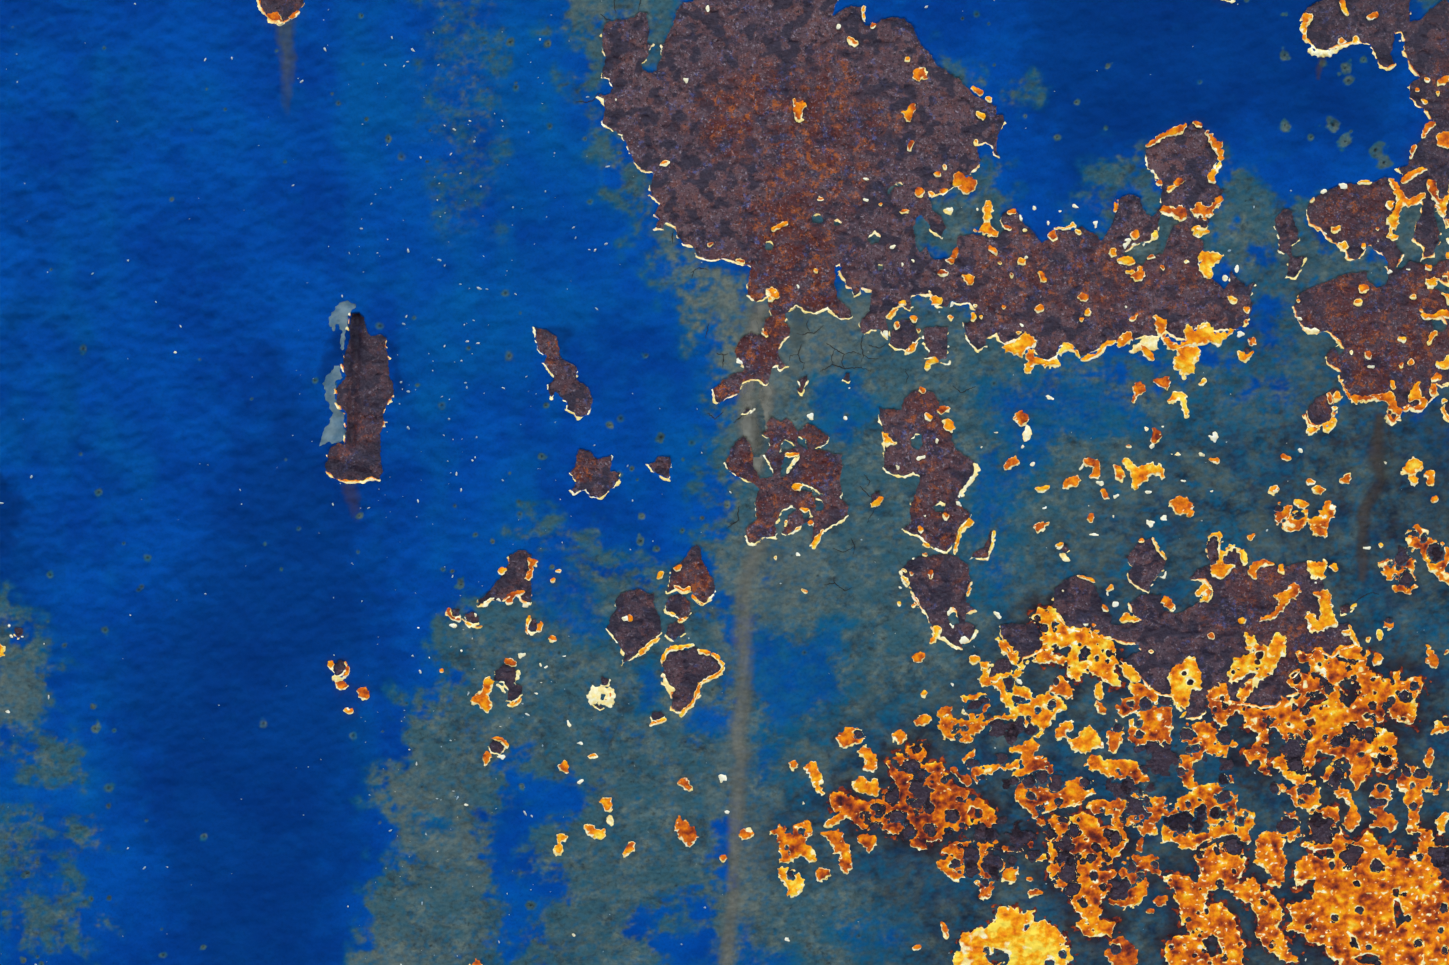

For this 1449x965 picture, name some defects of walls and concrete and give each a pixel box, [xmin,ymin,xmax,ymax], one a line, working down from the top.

corrosion [256,0,305,52]
corrosion [1274,0,1449,474]
corrosion [595,0,1256,571]
peeling [319,300,356,446]
corrosion [325,313,394,484]
corrosion [532,327,593,420]
corrosion [569,449,621,500]
corrosion [445,550,557,643]
corrosion [606,545,725,727]
corrosion [586,677,616,711]
corrosion [584,797,613,840]
corrosion [674,816,698,847]